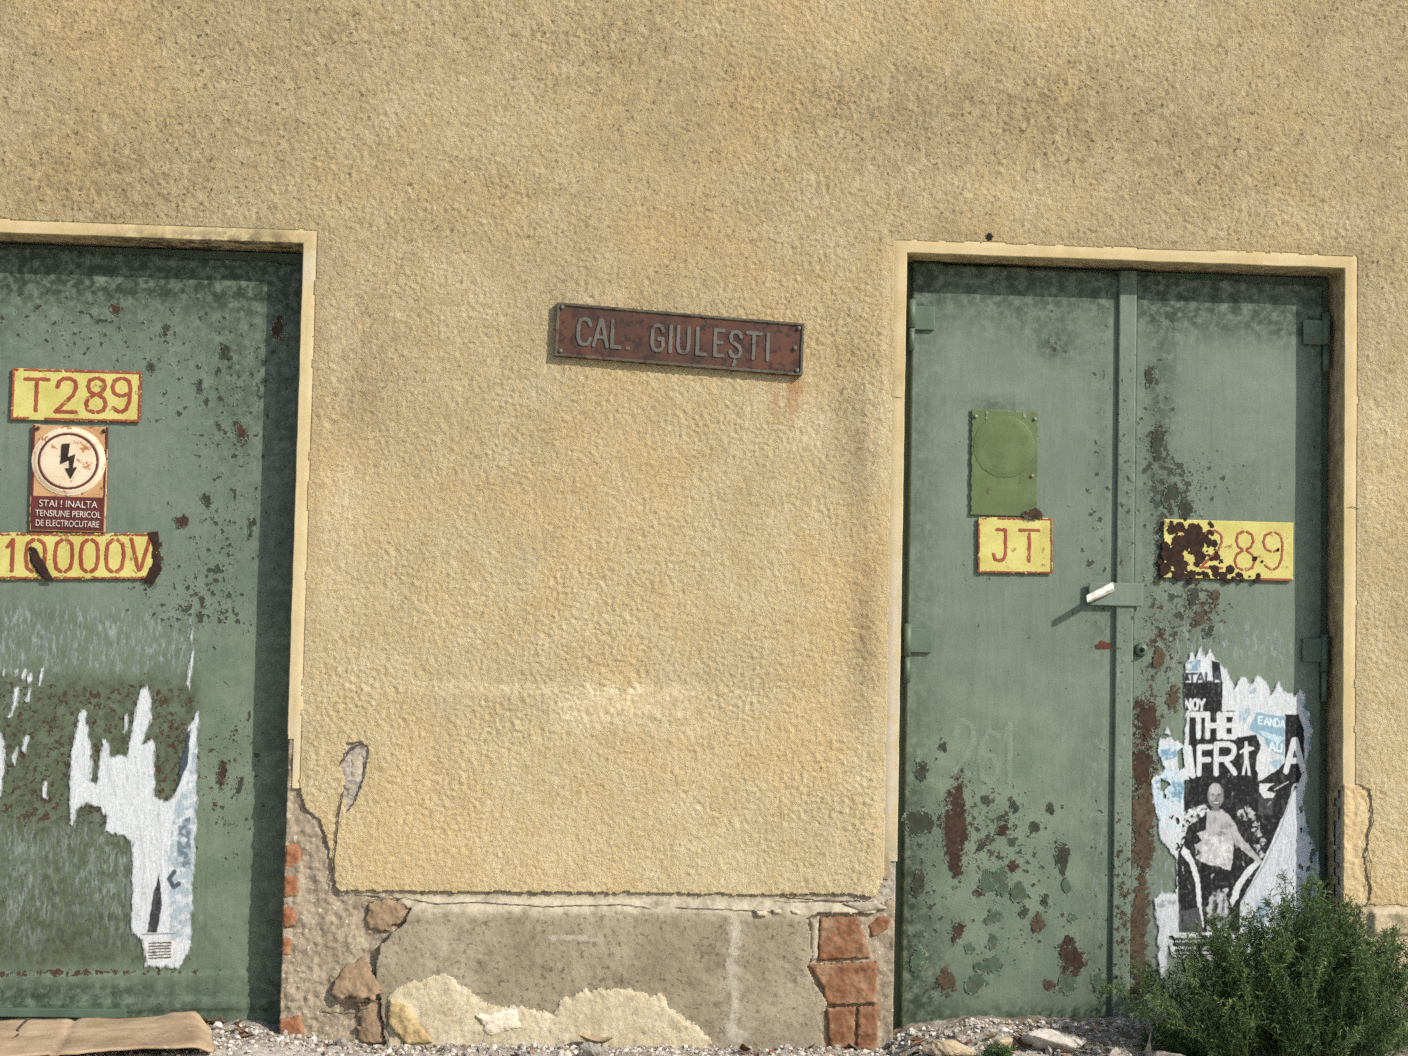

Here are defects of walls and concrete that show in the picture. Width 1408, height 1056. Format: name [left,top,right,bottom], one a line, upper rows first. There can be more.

rust [936,766,982,898]
rust [995,819,1015,840]
rust [1129,644,1181,1019]
spalling [278,739,712,1049]
spalling [754,861,927,1050]
rust [933,964,957,998]
rust [947,916,966,946]
rust [1005,860,1020,873]
rust [1028,912,1047,934]
rust [1044,933,1090,991]